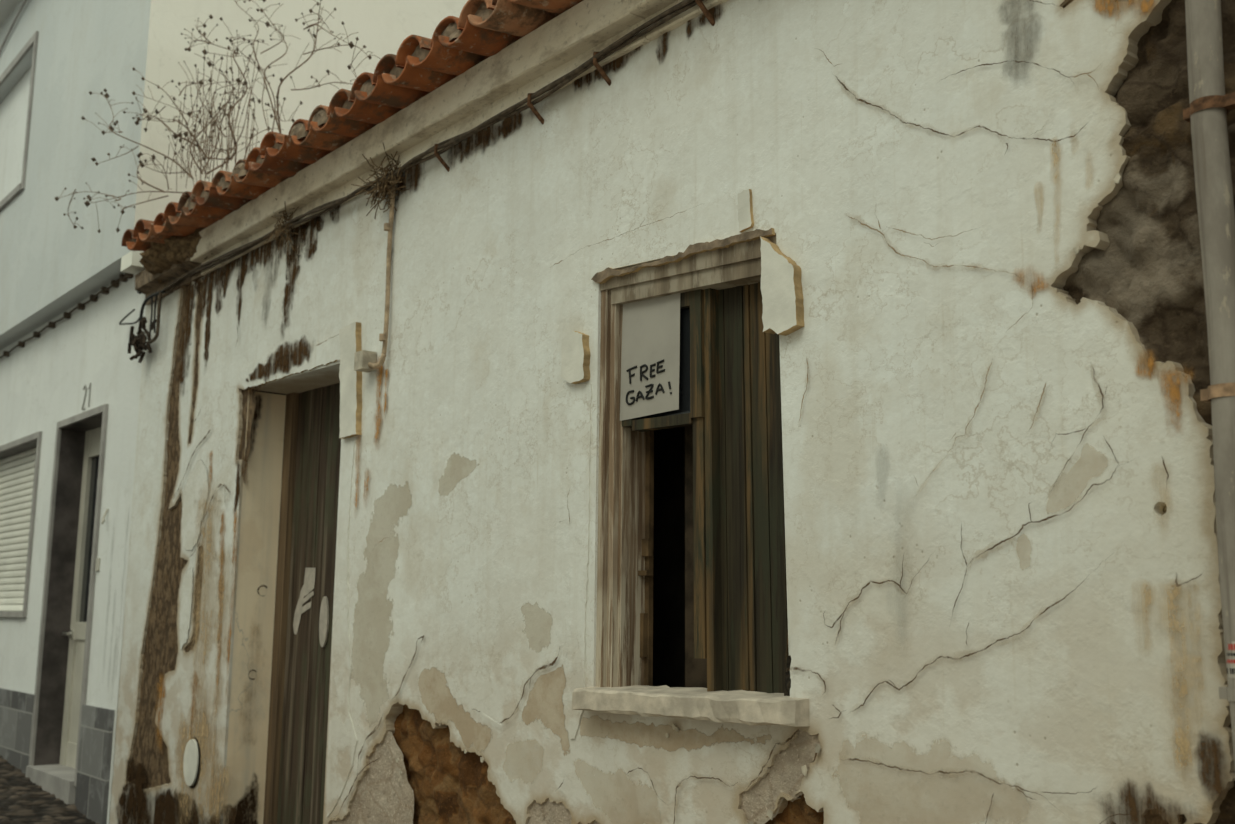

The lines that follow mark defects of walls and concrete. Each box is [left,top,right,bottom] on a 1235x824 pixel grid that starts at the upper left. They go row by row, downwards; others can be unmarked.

crack [822,51,1098,151]
corrosion [1094,0,1154,17]
spalling [1221,0,1235,95]
crack [850,217,1007,272]
spalling [1063,0,1212,426]
damp [179,205,340,512]
corrosion [1136,355,1192,421]
peeling [328,371,412,817]
crack [785,363,1118,719]
damp [116,713,258,824]
spalling [393,667,600,824]
crack [849,758,1096,822]